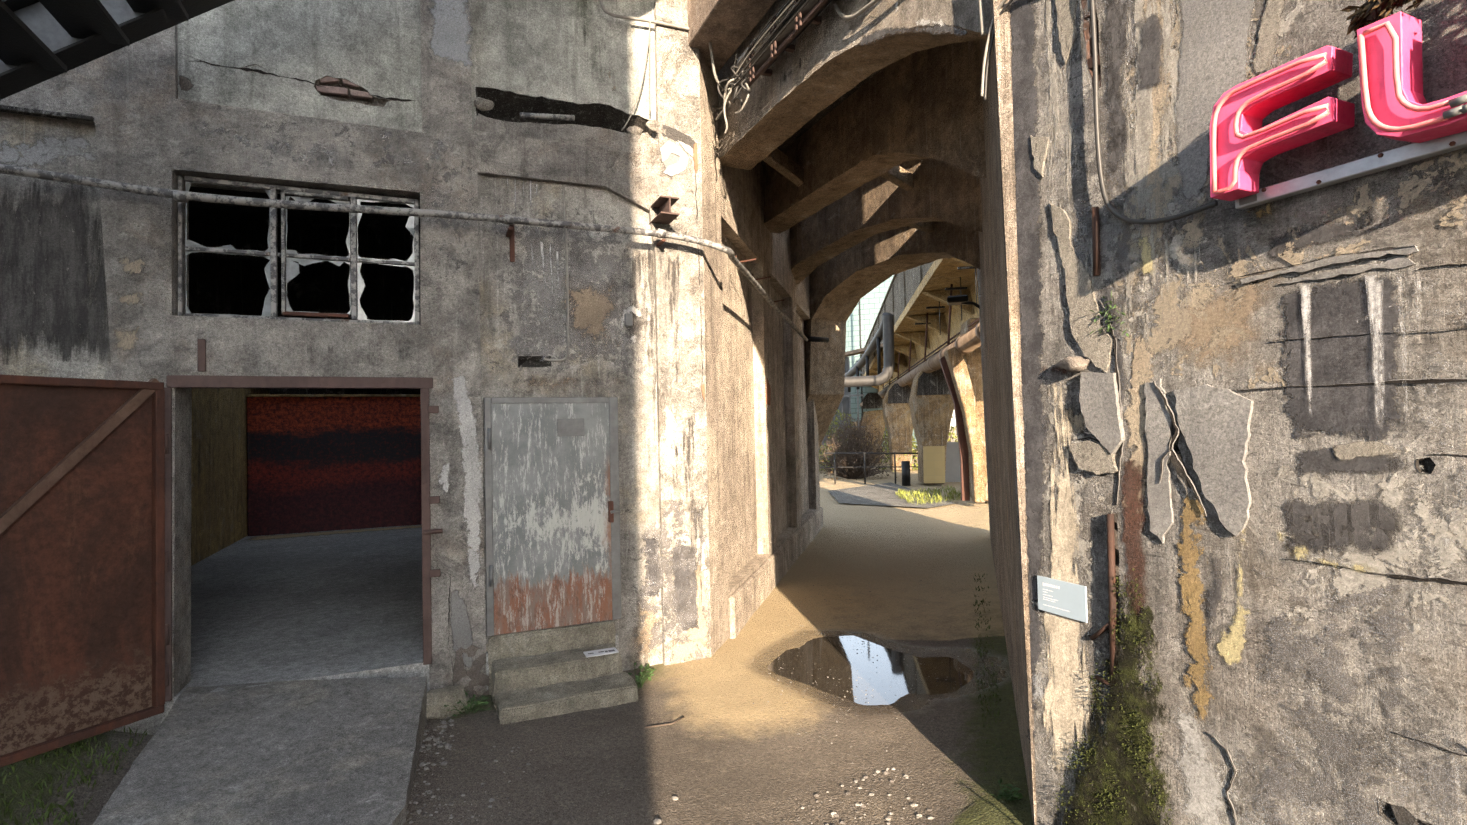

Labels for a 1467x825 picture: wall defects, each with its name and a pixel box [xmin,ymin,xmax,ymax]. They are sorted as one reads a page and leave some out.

crack [181,53,419,109]
spalling [475,70,698,177]
flaking render [1030,135,1049,177]
flaking render [1055,0,1078,63]
spalling [1134,49,1170,254]
flaking render [1049,202,1154,686]
leakage [1010,0,1467,825]
spalling [1177,494,1215,720]
crack [1283,558,1467,584]
crack [1394,732,1467,756]